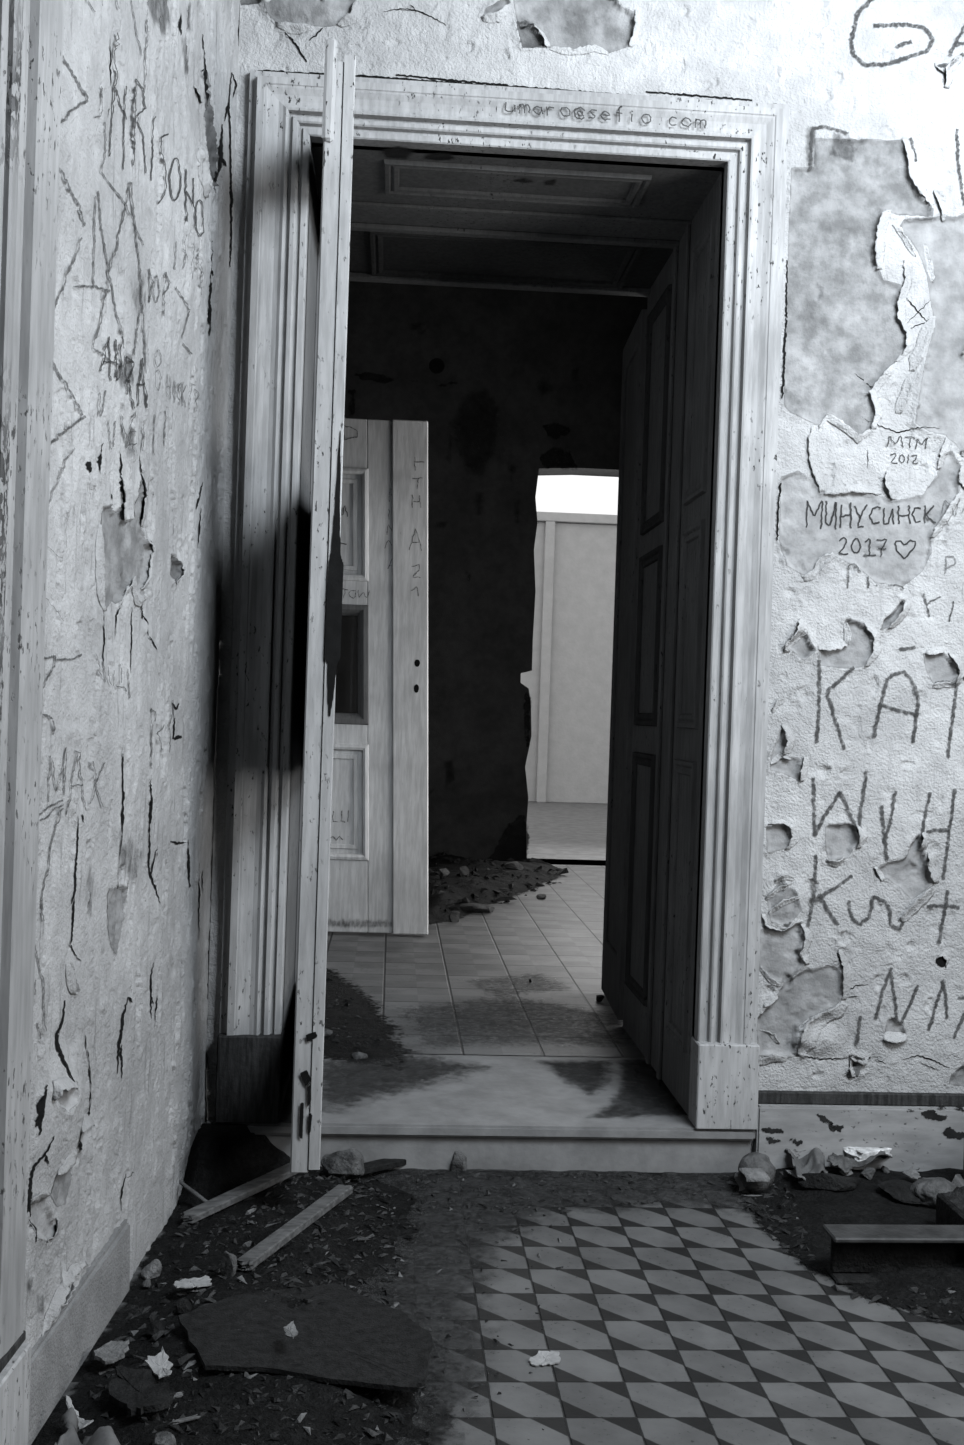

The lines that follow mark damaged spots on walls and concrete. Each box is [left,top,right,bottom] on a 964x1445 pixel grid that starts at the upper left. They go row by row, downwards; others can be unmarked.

peeling [240,0,362,35]
peeling [481,0,643,55]
peeling [779,137,964,669]
peeling [95,474,186,611]
peeling [923,648,964,689]
peeling [770,698,809,782]
peeling [766,823,800,853]
peeling [825,823,868,868]
peeling [873,832,940,922]
peeling [757,873,851,1066]
peeling [883,1018,908,1044]
peeling [849,1053,872,1078]